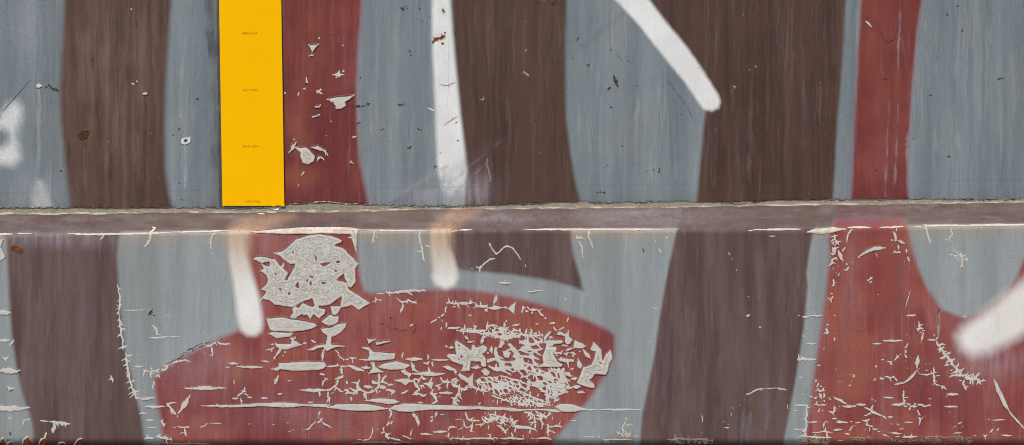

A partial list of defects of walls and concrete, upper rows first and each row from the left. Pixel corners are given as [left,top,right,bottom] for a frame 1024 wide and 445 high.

peeling [284,77,370,122]
peeling [288,135,329,186]
peeling [825,231,910,303]
peeling [0,337,21,391]
peeling [225,226,488,426]
peeling [431,280,613,394]
peeling [872,314,935,410]
peeling [0,404,31,426]
peeling [139,396,166,429]
peeling [809,379,866,413]